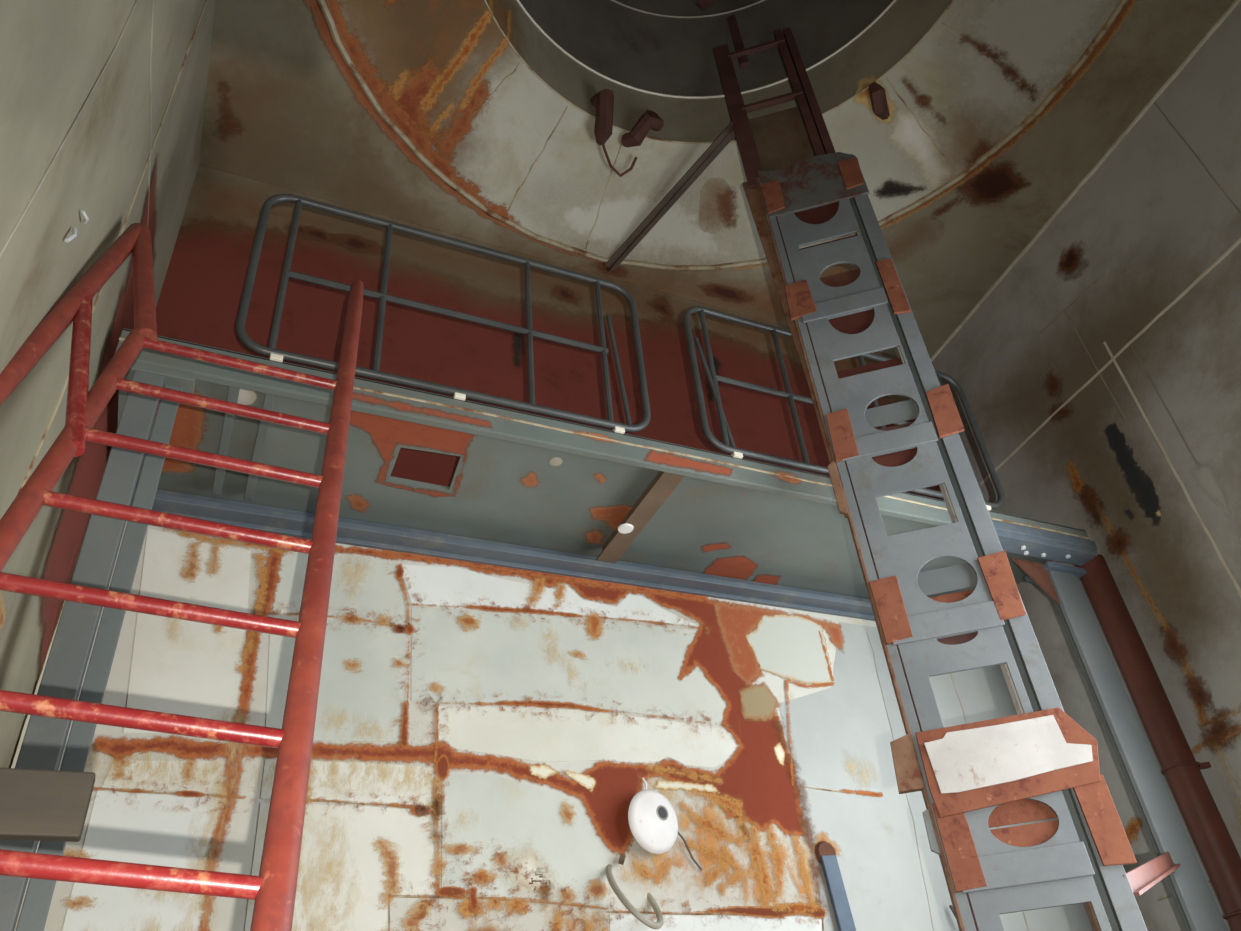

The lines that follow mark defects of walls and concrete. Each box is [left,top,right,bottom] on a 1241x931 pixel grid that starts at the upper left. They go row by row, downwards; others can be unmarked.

rust [304,0,627,279]
damp [996,282,1195,623]
rust [164,528,290,616]
rust [335,545,708,608]
rust [585,613,604,640]
rust [1067,460,1241,757]
rust [234,630,261,724]
rust [199,742,246,871]
rust [374,839,401,909]
rust [400,895,441,931]
rust [443,844,608,931]
rust [632,763,842,907]